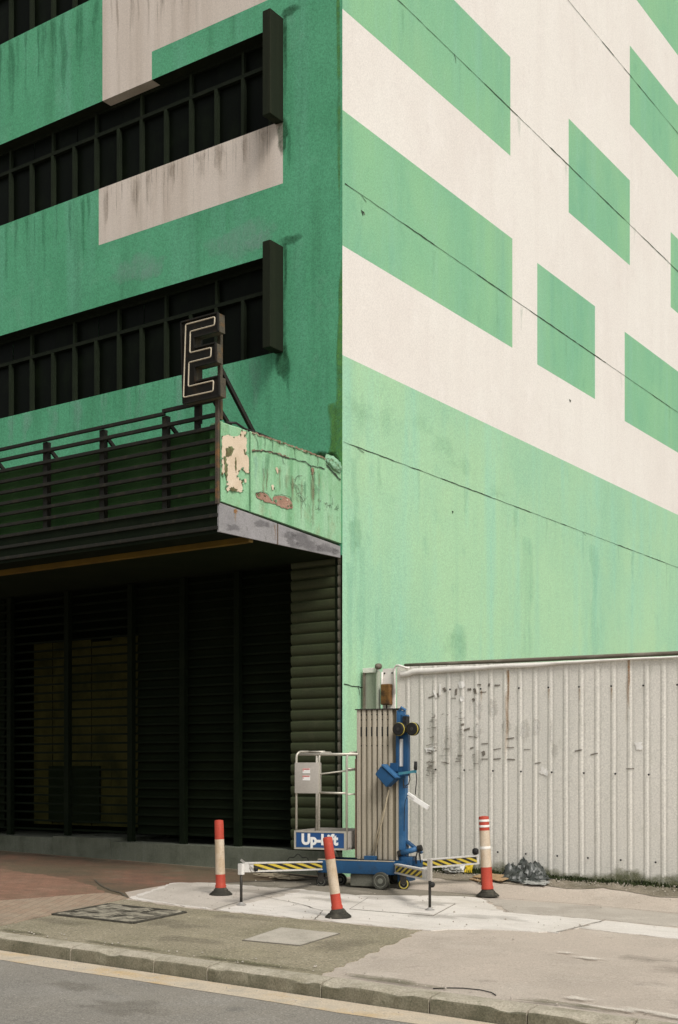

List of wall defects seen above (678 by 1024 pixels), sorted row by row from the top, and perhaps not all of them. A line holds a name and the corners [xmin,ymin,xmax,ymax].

peeling [221,429,326,509]